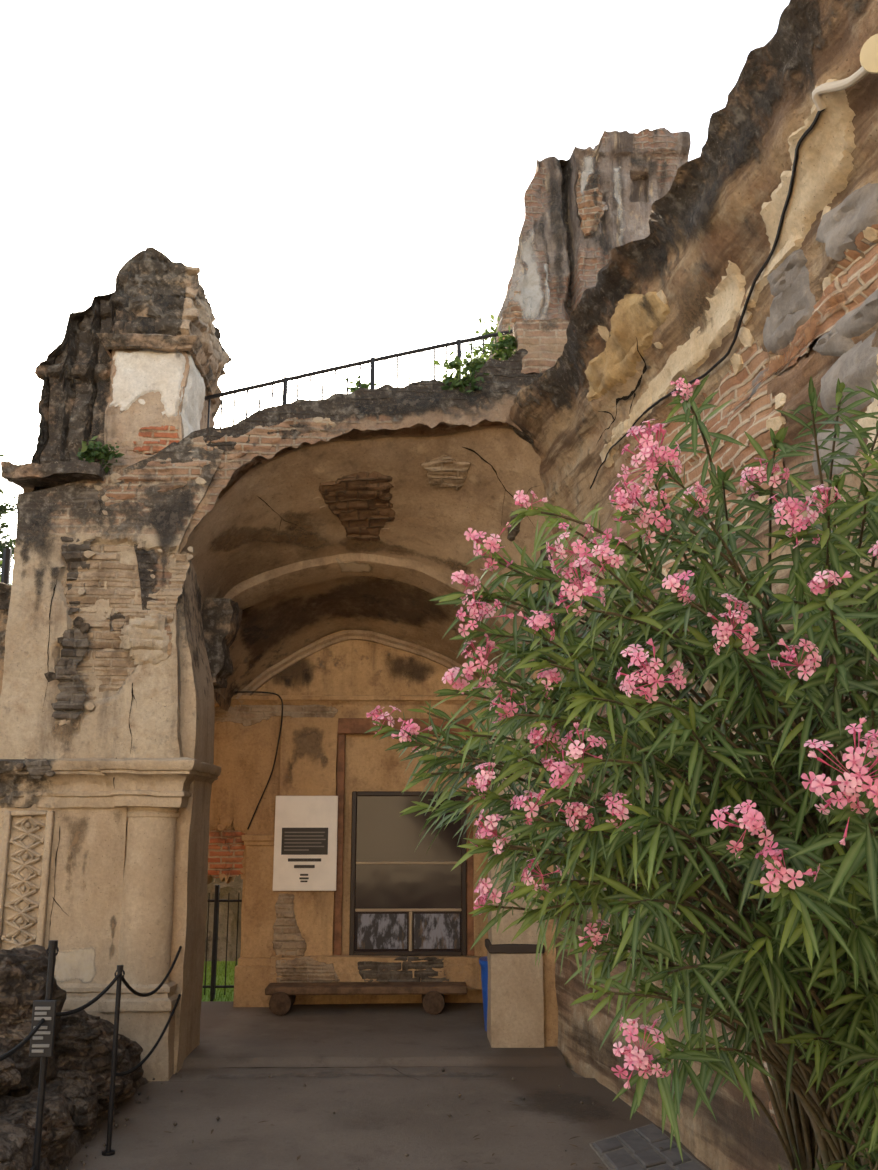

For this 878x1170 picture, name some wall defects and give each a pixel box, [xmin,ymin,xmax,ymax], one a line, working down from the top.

flaking render [576,171,608,237]
flaking render [494,279,531,361]
flaking render [585,79,878,580]
crack [597,338,647,443]
flaking render [44,349,338,729]
flaking render [313,471,395,541]
crack [463,447,541,527]
leakage [389,658,432,680]